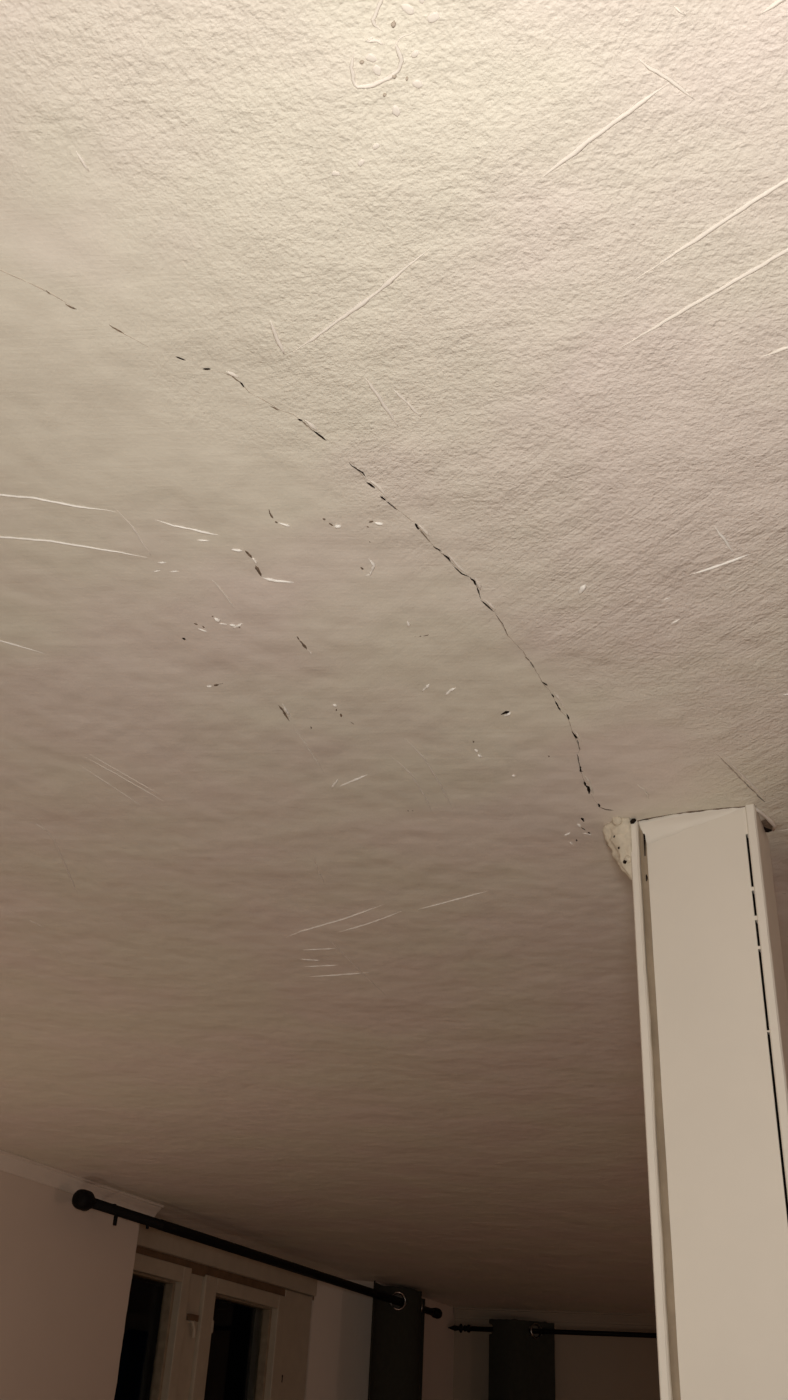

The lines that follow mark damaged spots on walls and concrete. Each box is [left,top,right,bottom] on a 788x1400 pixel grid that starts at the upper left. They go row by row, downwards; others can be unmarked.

crack [0,270,75,309]
crack [177,357,325,440]
crack [350,462,765,822]